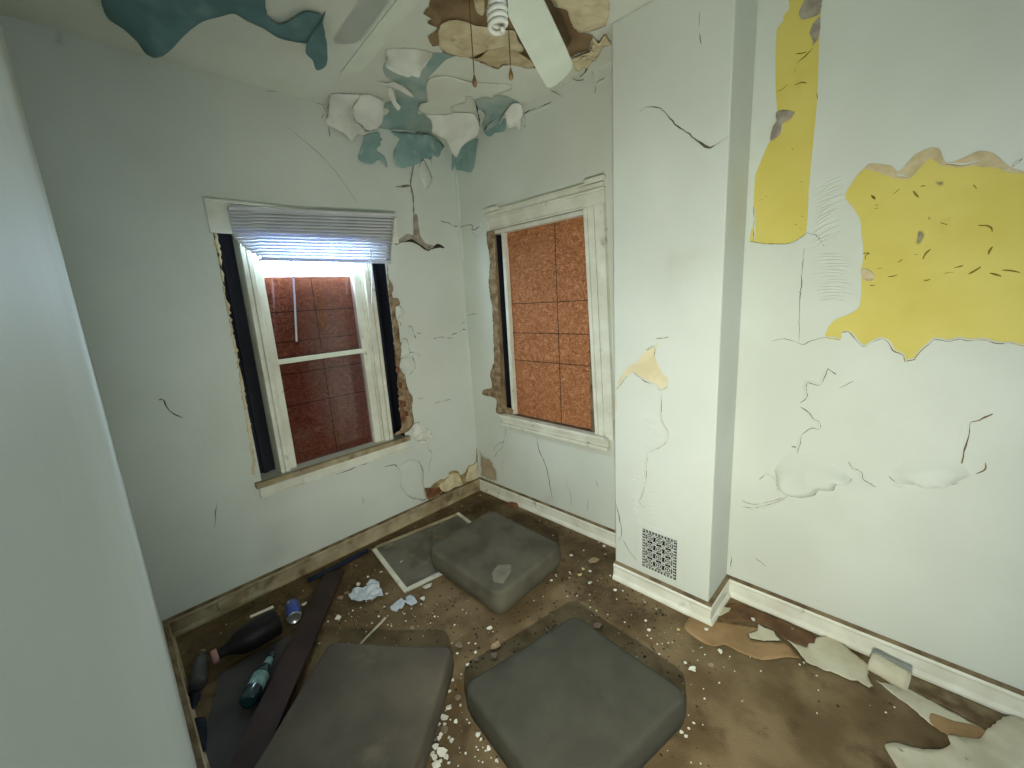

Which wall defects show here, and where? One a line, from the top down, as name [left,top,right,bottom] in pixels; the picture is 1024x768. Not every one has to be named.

peeling [101,0,328,70]
flaking render [544,0,612,81]
flaking render [326,0,535,189]
crack [639,106,726,149]
peeling [750,0,822,246]
crack [395,166,480,251]
peeling [825,147,1024,362]
flaking render [387,265,433,444]
crack [616,391,669,560]
crack [792,368,853,455]
crack [847,461,904,488]
crack [957,411,993,474]